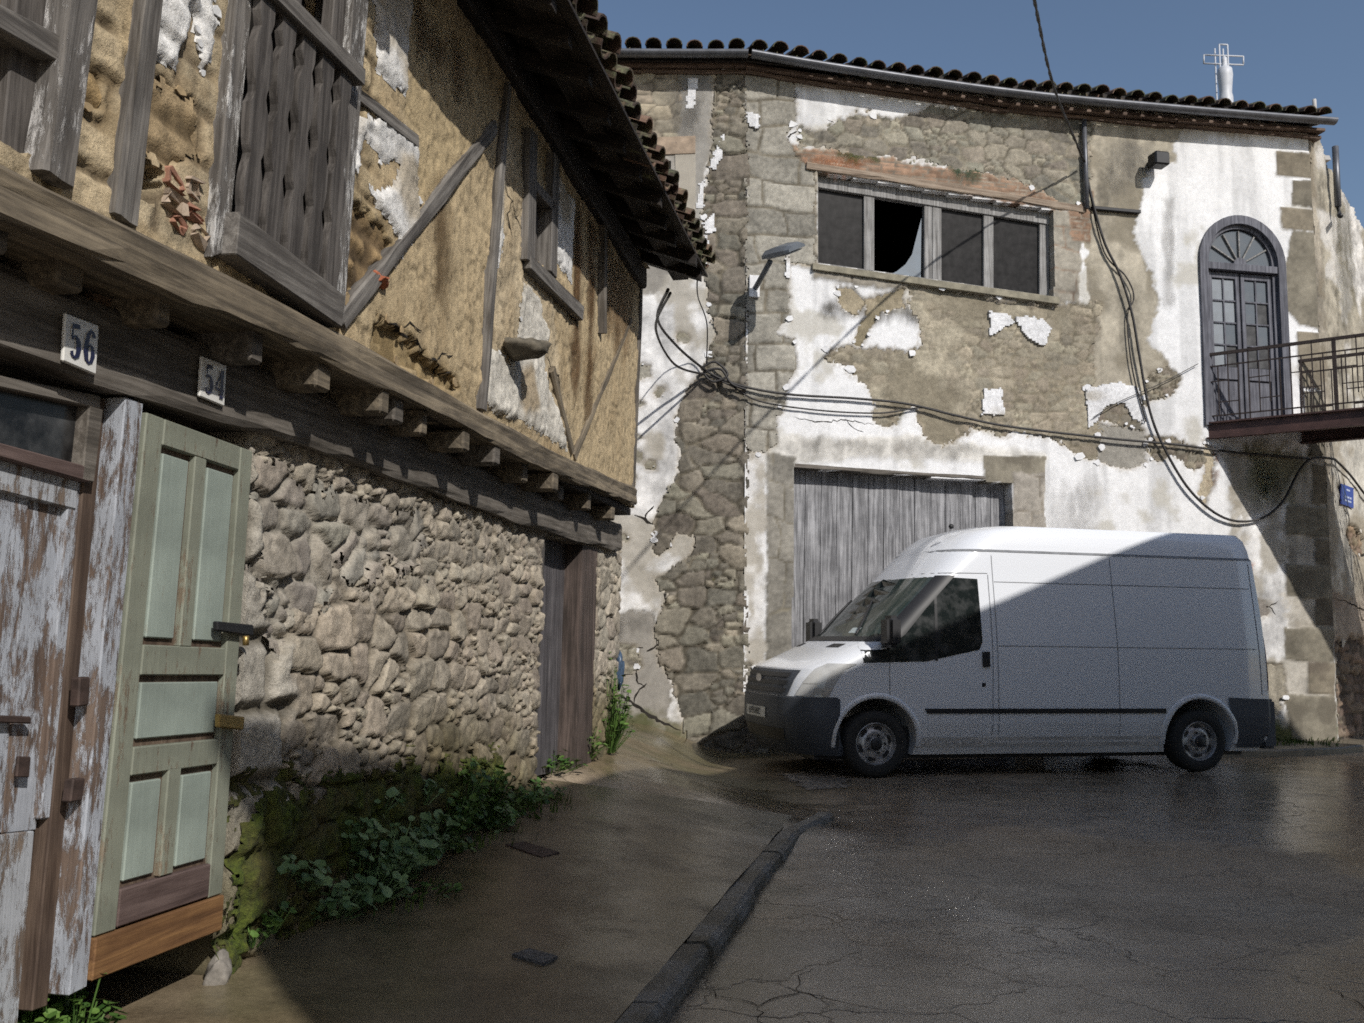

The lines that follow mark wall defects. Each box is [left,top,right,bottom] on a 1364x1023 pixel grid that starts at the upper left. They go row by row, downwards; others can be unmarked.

spalling [146,0,222,251]
peeling [345,113,423,306]
peeling [619,69,1094,751]
peeling [821,285,1214,503]
spalling [1334,637,1364,741]